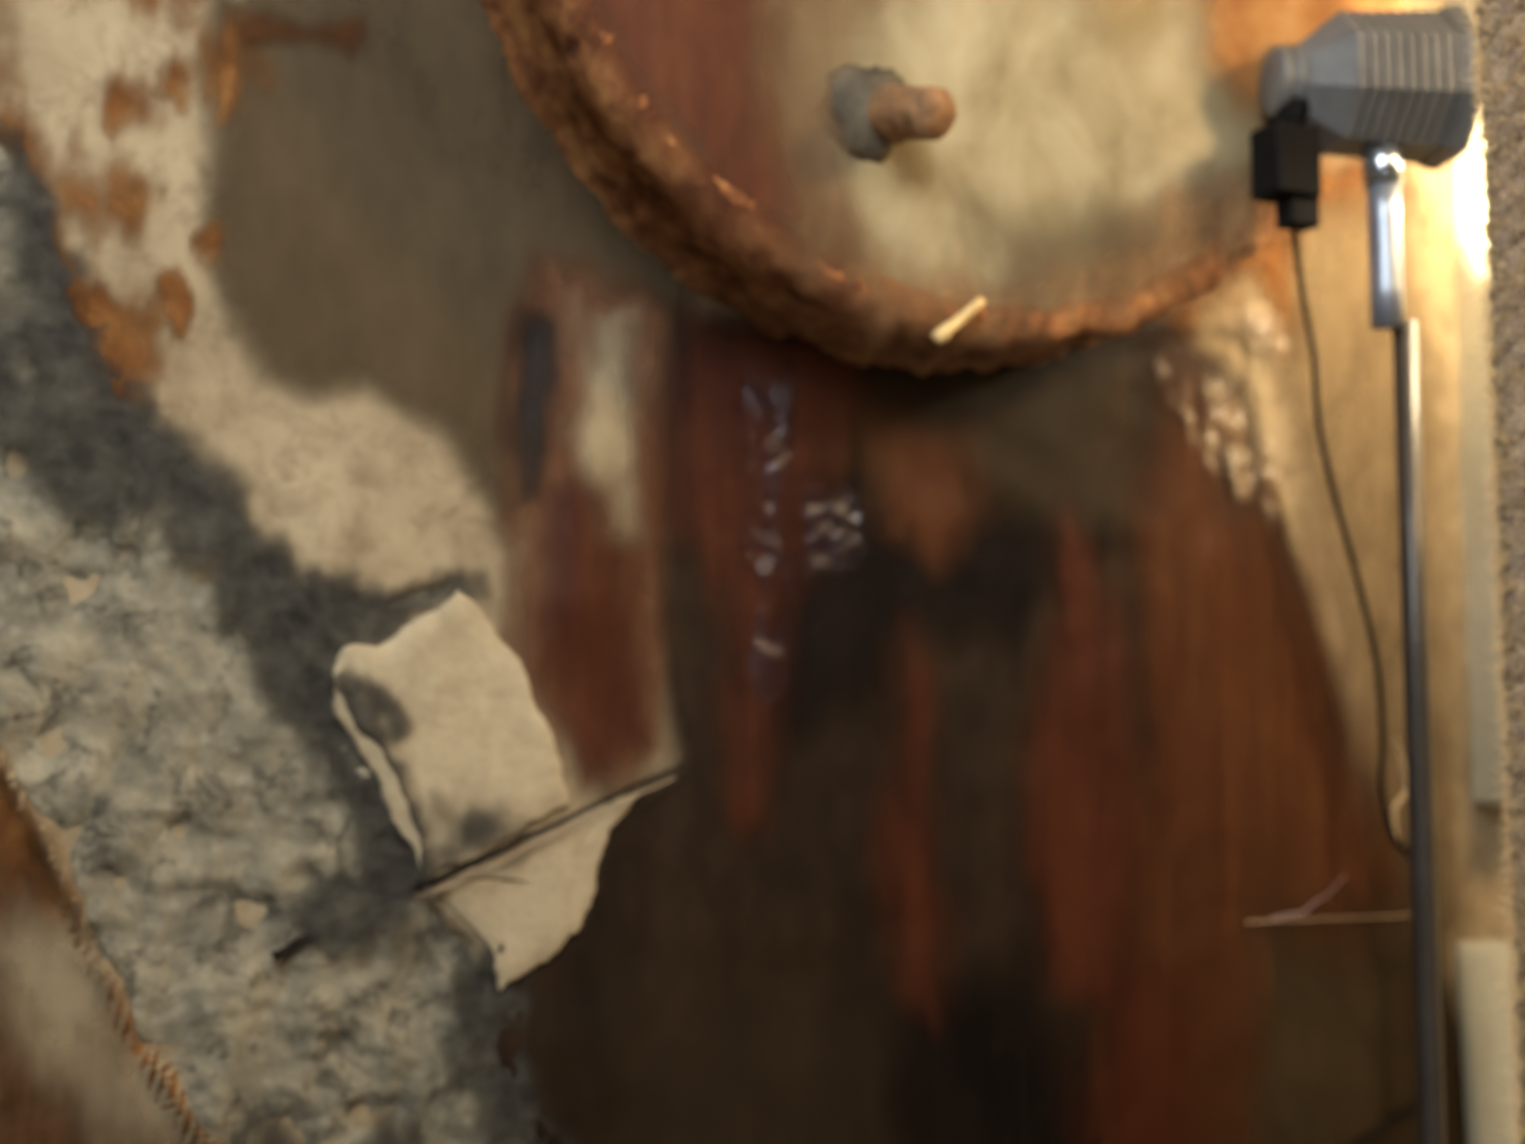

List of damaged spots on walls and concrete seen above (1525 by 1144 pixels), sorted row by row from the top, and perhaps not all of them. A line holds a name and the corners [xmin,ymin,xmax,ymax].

rust [103,57,188,136]
rust [53,165,145,236]
rust [191,223,222,260]
rust [479,0,1305,376]
rust [1319,159,1367,219]
rust [61,259,193,396]
rust [506,259,666,784]
damp [210,0,1419,1144]
spalling [0,141,639,1144]
crack [411,763,685,900]
crack [271,935,307,961]
damp [1440,958,1467,1144]